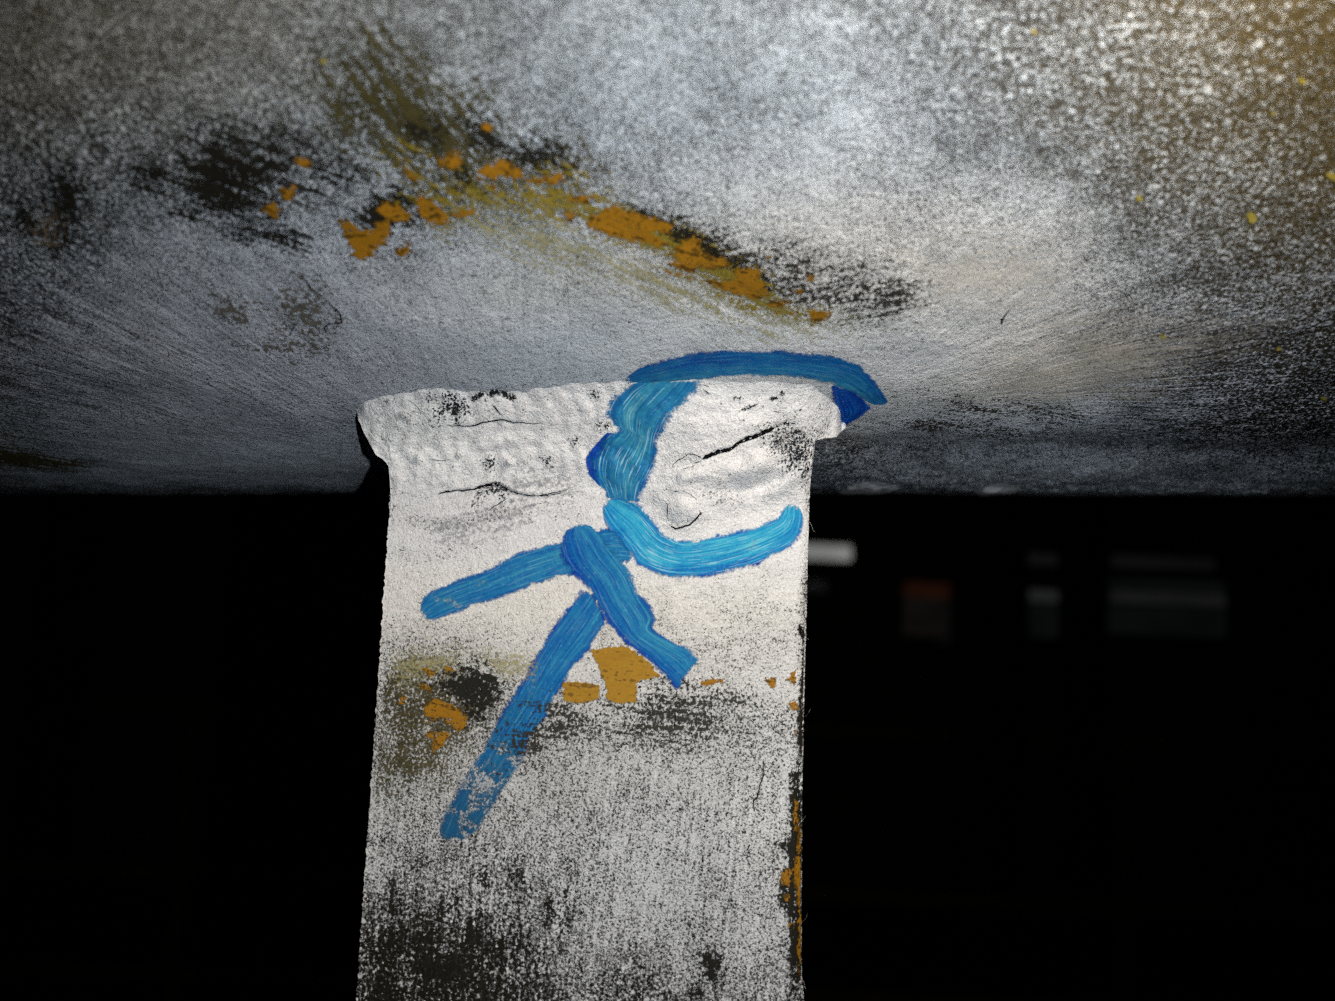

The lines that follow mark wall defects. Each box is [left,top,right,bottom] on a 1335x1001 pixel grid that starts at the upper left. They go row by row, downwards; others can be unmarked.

water stain [114,144,313,259]
crack [408,400,540,427]
crack [430,459,576,512]
crack [666,427,774,530]
water stain [437,842,568,981]
water stain [687,984,711,1001]